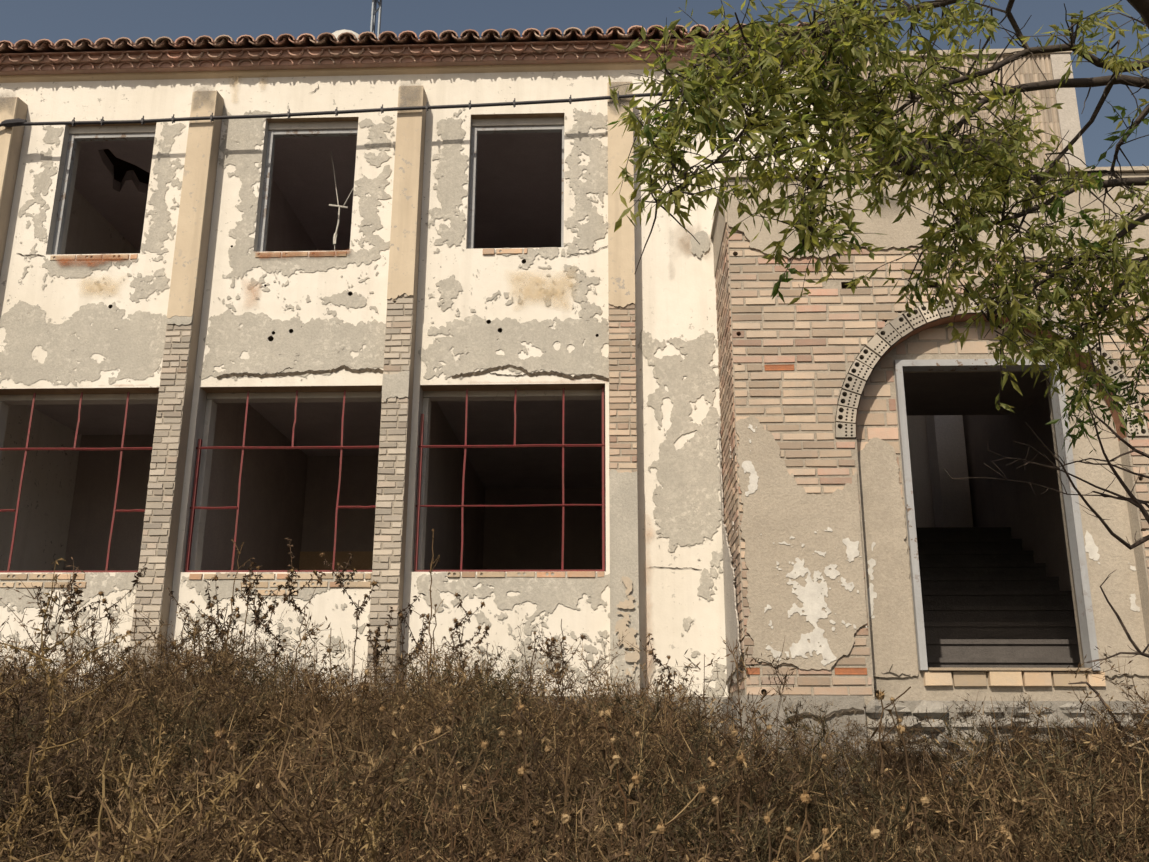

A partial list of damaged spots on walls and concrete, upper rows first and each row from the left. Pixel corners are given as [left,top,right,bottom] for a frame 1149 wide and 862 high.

crack [216,365,383,379]
crack [452,364,609,381]
peeling [0,106,1149,697]